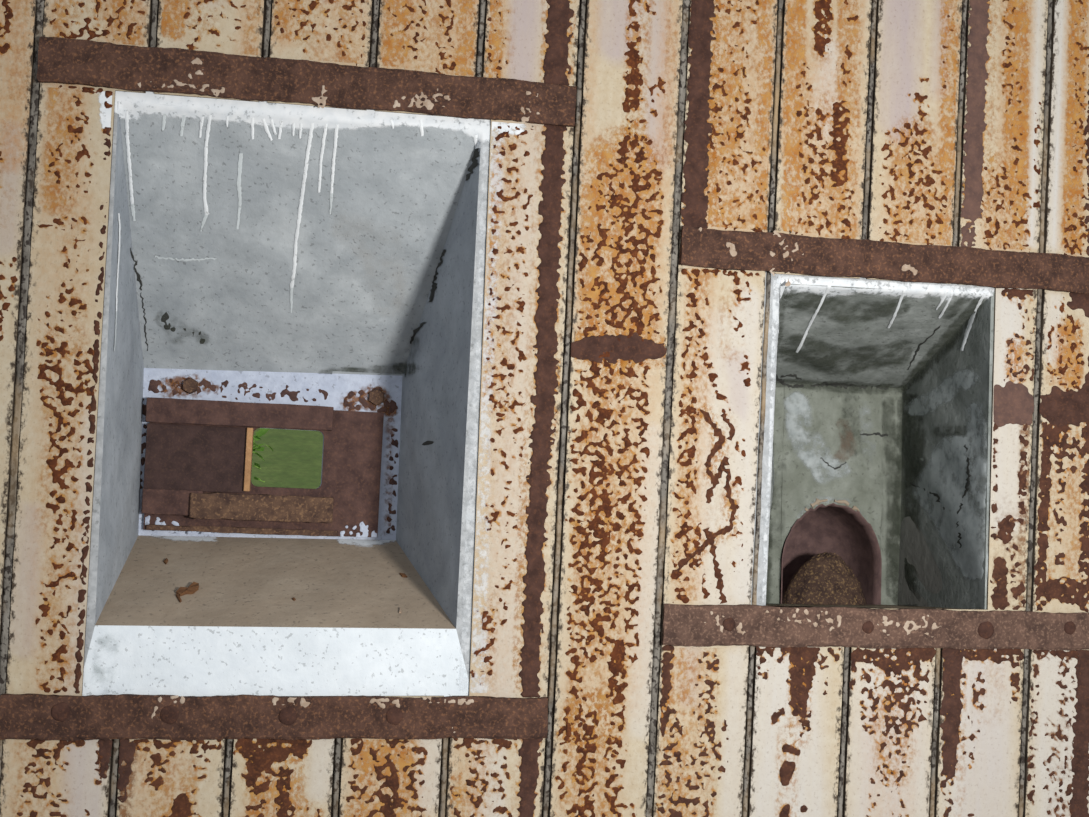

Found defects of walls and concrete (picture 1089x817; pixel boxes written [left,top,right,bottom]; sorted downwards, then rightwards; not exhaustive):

rust [35,85,113,694]
leakage [114,111,136,351]
leakage [199,115,212,232]
leakage [250,118,339,313]
rust [470,0,667,817]
rust [670,268,760,604]
leakage [785,392,850,482]
leakage [778,280,912,373]
rust [990,288,1089,612]
leakage [766,530,774,604]
rust [17,738,321,817]
rust [756,646,1089,817]